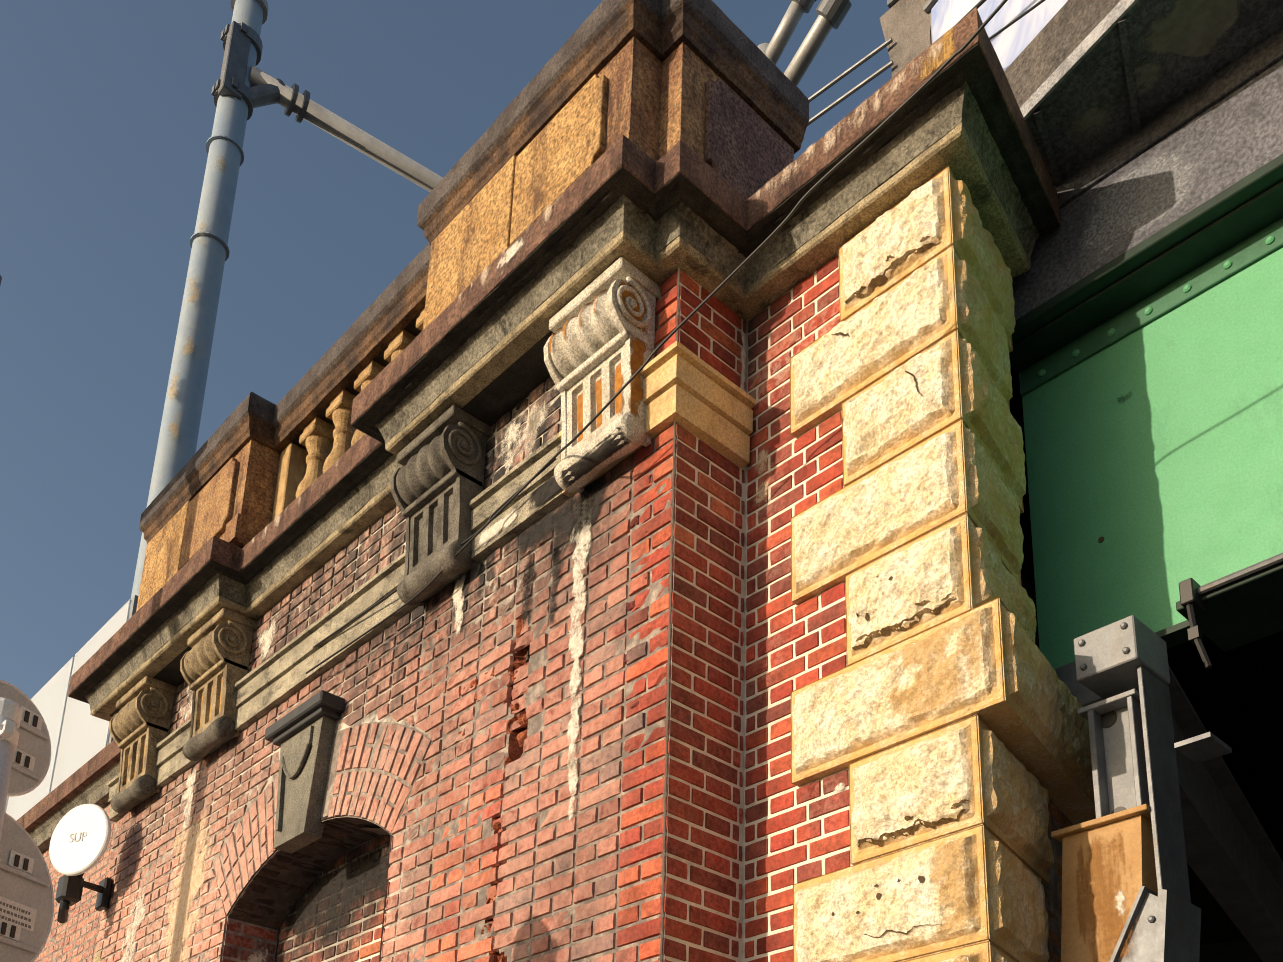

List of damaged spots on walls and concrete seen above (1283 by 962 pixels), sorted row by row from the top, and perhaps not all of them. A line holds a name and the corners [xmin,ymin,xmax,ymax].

spalling [845,236,941,304]
corrosion [549,281,646,443]
crack [905,370,921,394]
leakage [452,575,466,632]
leakage [521,555,534,626]
leakage [548,491,592,819]
spalling [852,593,954,650]
spalling [458,654,528,747]
spalling [856,799,971,847]
corrosion [1077,836,1129,962]